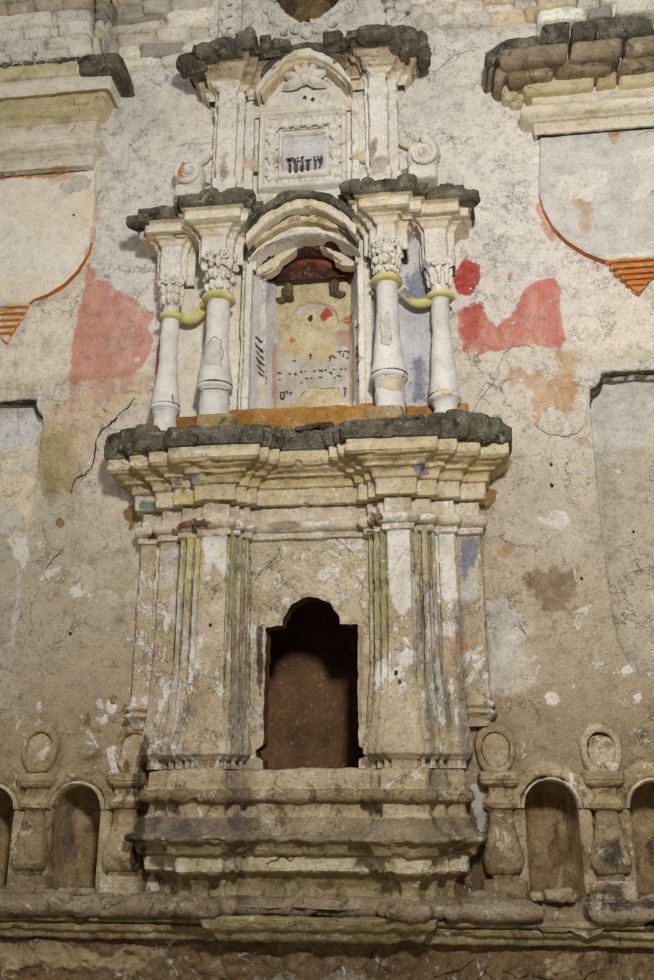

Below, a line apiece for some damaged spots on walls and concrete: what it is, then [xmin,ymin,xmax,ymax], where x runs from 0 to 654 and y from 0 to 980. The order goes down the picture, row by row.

flaking render [550,166,612,204]
flaking render [629,146,654,206]
crack [70,398,134,494]
peeling [172,473,202,506]
flaking render [162,534,249,736]
spalling [95,700,118,725]
spalling [106,746,121,775]
crack [433,928,555,980]
crack [575,934,621,980]